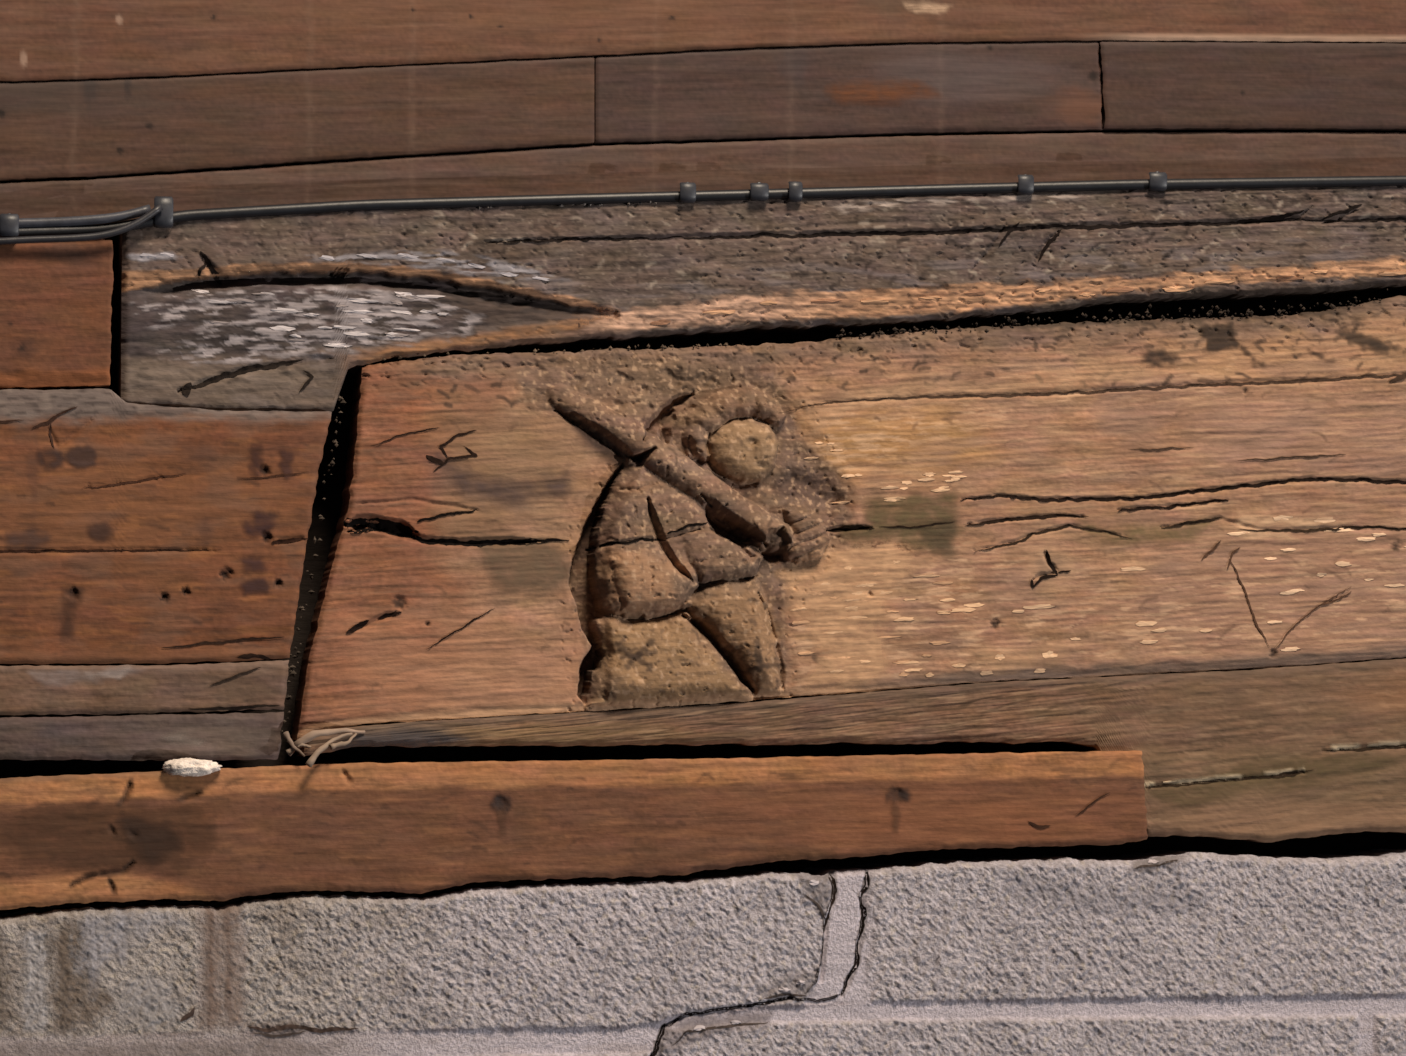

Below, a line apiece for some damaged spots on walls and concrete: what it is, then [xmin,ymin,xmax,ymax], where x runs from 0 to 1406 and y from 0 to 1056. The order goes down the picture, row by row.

crack [779,373,1406,413]
crack [1130,445,1194,453]
crack [343,509,708,551]
crack [828,454,1406,652]